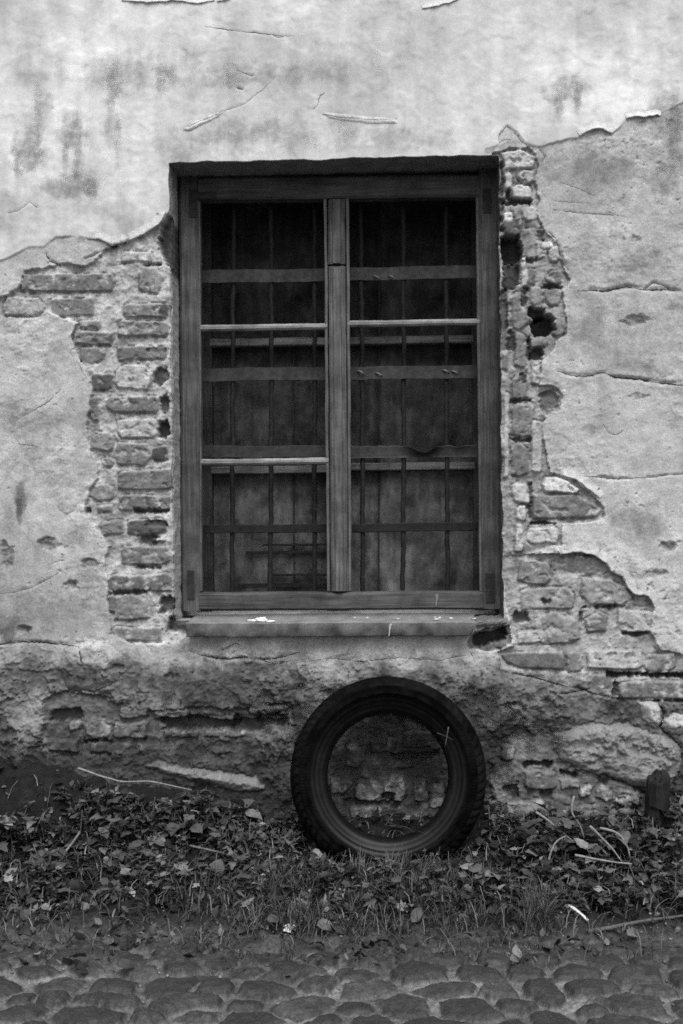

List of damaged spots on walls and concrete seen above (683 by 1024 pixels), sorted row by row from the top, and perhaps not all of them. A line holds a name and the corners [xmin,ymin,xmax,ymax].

peeling [576,120,616,136]
crack [558,371,683,386]
flaking render [0,208,188,645]
flaking render [467,147,683,704]
crack [584,472,683,480]
flaking render [163,671,180,681]
flaking render [499,700,526,711]
flaking render [33,690,295,760]
flaking render [489,728,645,816]